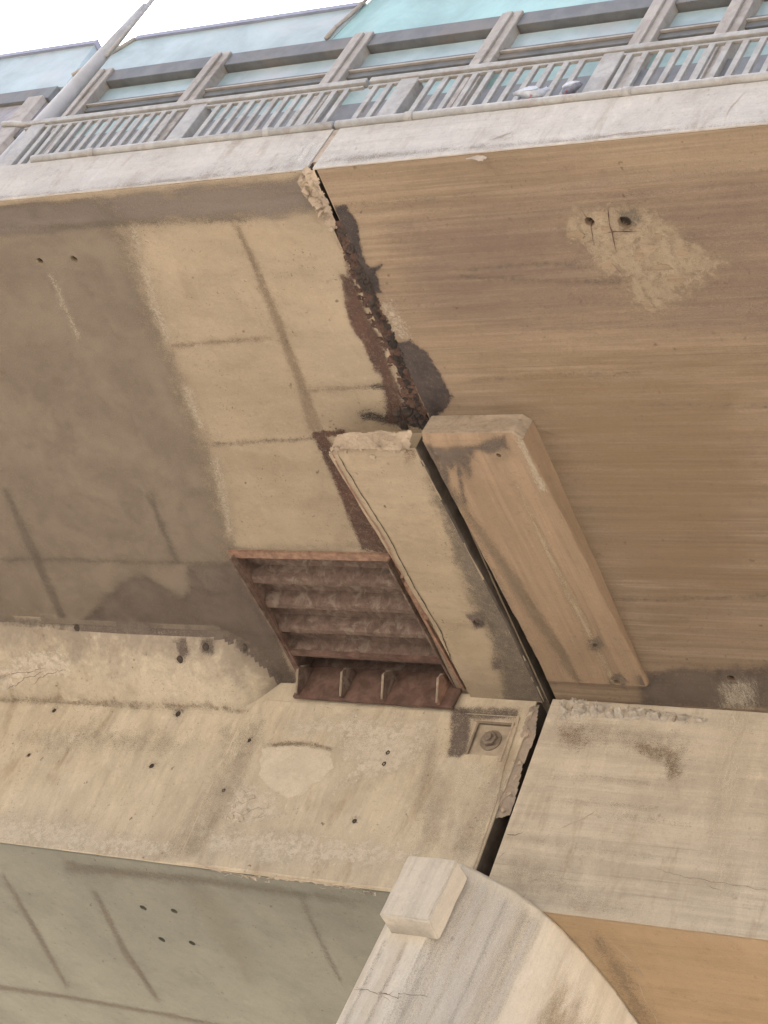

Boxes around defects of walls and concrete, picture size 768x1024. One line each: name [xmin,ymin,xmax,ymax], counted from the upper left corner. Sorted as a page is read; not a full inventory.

spalling [297,166,337,231]
rust [335,221,429,426]
damp [334,141,768,430]
spalling [329,429,417,466]
rust [311,428,459,675]
spalling [496,705,539,818]